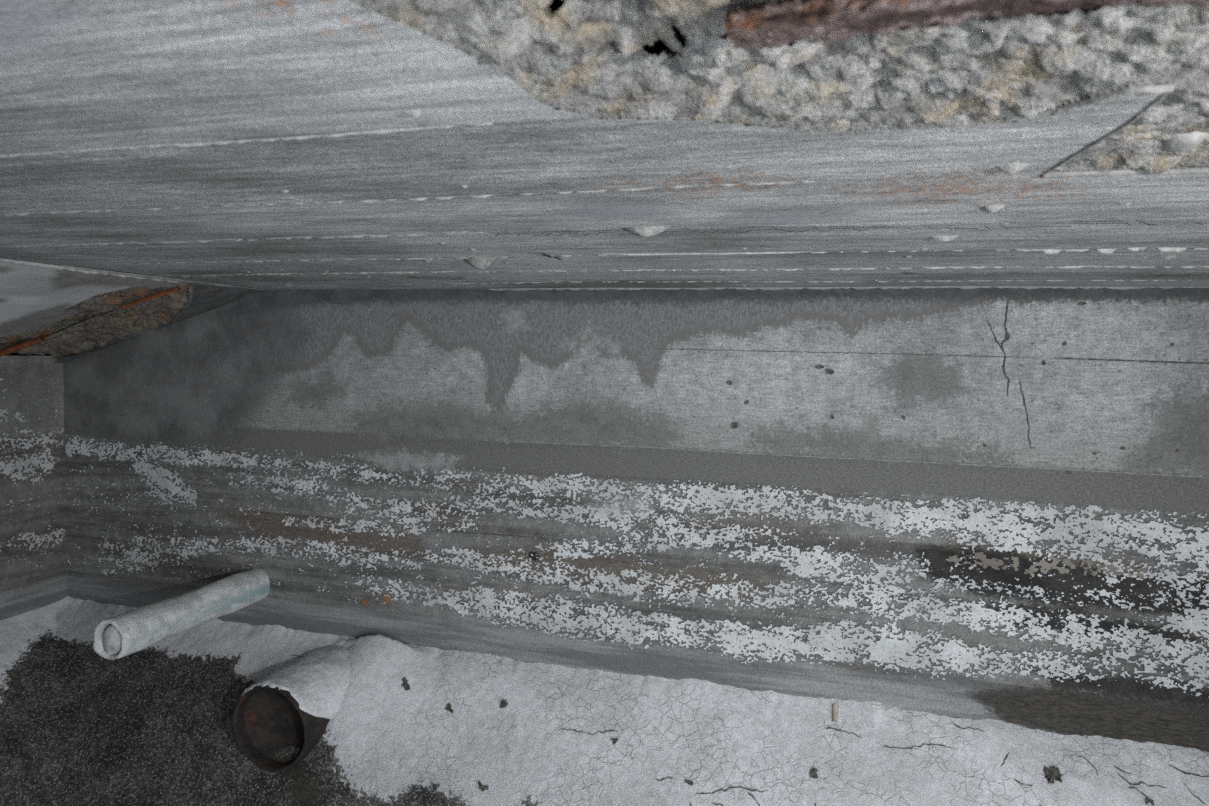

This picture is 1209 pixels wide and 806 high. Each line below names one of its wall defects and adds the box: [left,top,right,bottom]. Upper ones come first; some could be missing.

spalling [348,0,1209,178]
spalling [0,282,190,359]
damp [0,269,1209,516]
crack [671,272,1209,447]
peeling [0,378,1209,699]
damp [916,546,1209,642]
damp [0,629,468,806]
crack [562,728,615,736]
crack [655,776,768,806]
crack [826,723,982,749]
crack [1078,756,1209,805]